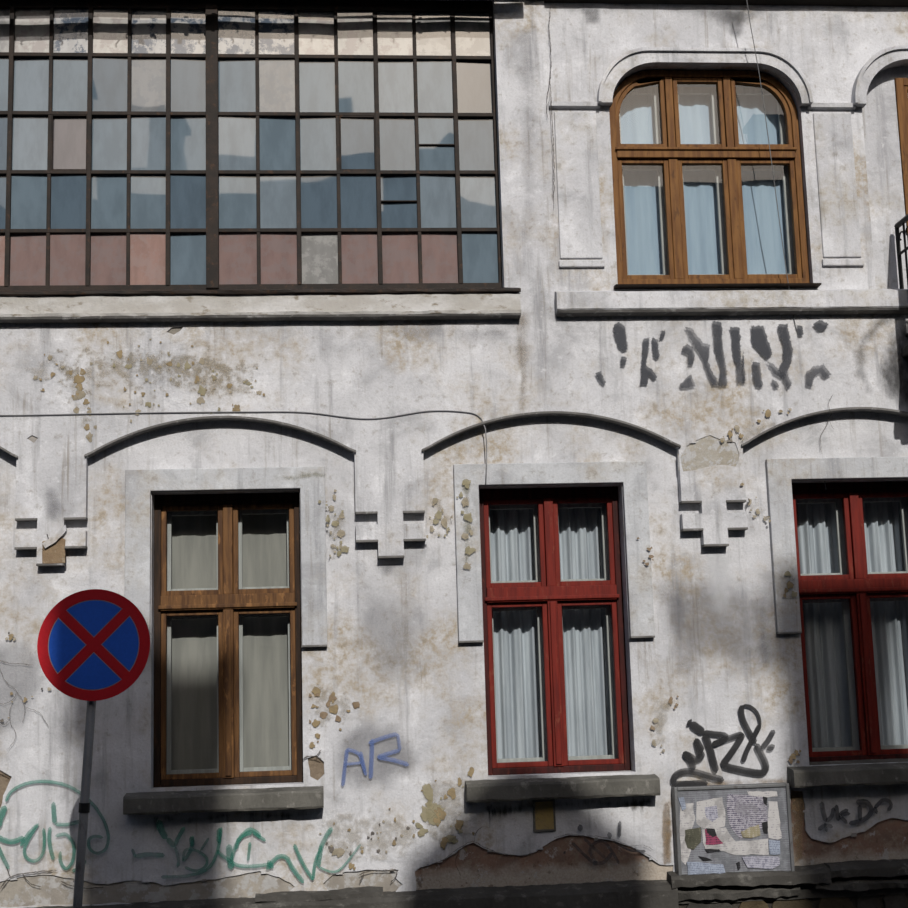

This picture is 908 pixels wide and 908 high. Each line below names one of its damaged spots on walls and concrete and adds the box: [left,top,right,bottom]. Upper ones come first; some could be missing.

peeling [33,354,97,442]
peeling [111,350,218,423]
leakage [884,324,908,401]
flaking render [678,425,744,471]
flaking render [42,525,67,564]
peeling [426,479,476,570]
crack [0,660,48,748]
peeling [308,687,360,780]
flaking render [0,772,11,808]
flaking render [319,767,673,892]
flaking render [790,790,908,866]
flaking render [0,870,295,907]